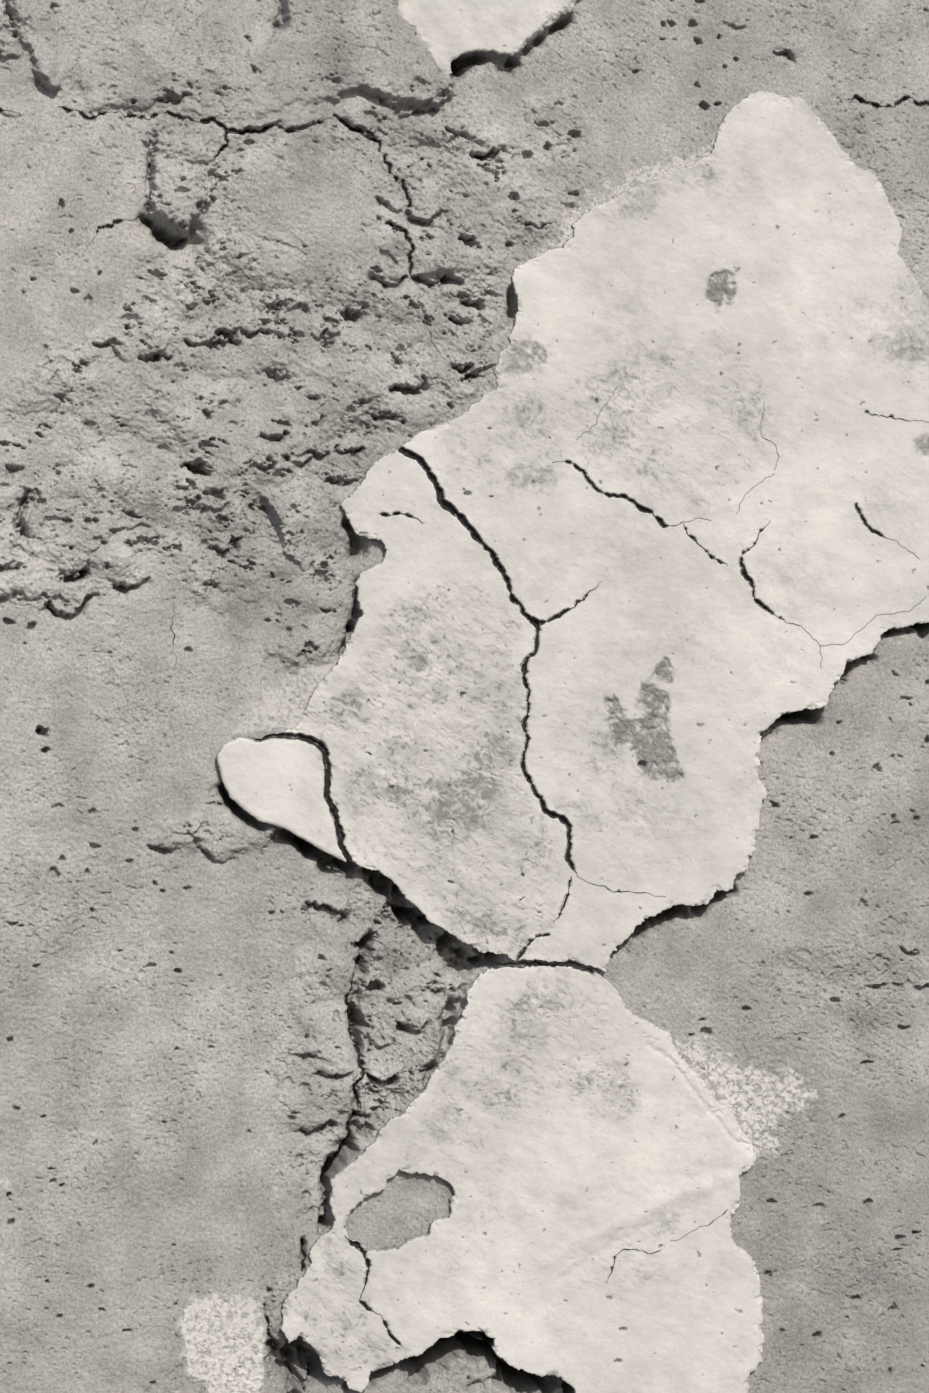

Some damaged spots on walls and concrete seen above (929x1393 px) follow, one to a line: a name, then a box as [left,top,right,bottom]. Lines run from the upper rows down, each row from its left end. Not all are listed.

crack [845,96,929,108]
crack [57,106,441,354]
spalling [0,0,592,668]
crack [552,388,925,668]
flaking render [216,737,346,862]
crack [254,733,351,861]
crack [379,448,666,974]
flaking render [263,90,929,1393]
crack [333,942,365,1157]
crack [263,1300,276,1350]
crack [301,1197,402,1346]